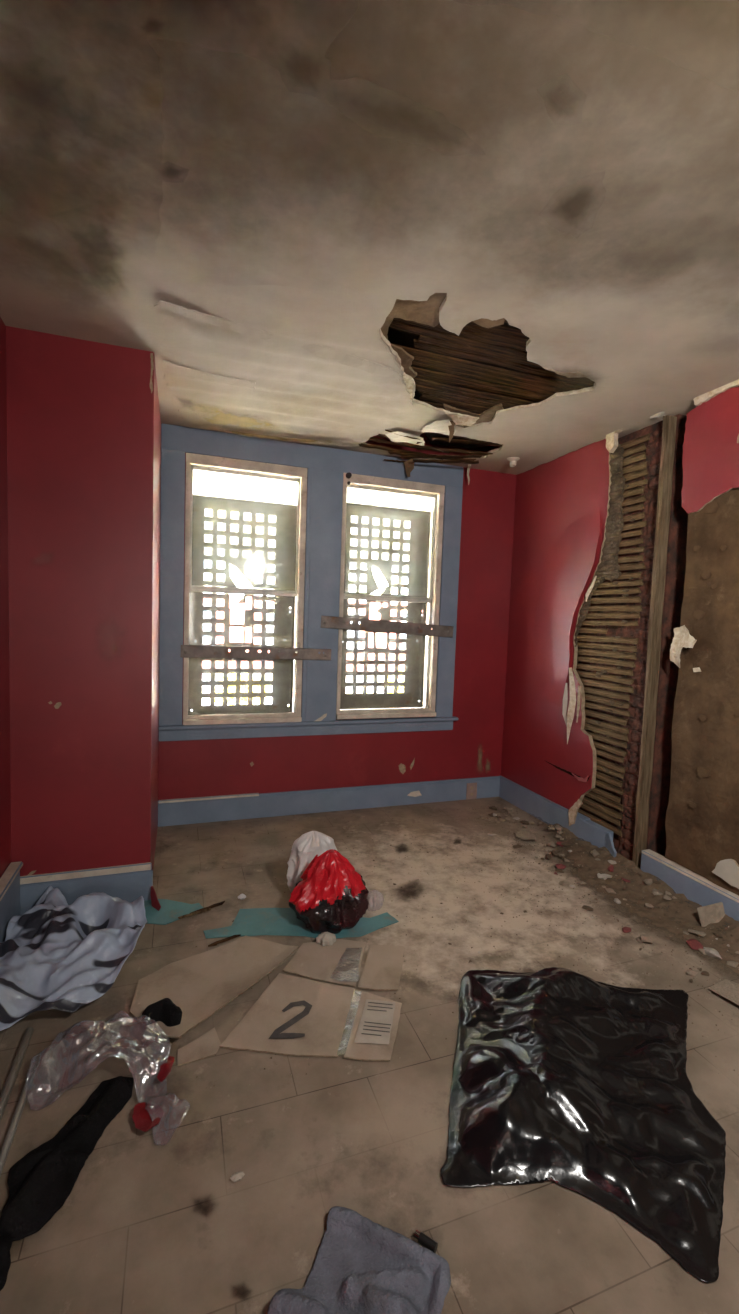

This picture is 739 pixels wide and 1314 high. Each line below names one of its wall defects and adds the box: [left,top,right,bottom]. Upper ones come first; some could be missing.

flaking render [562,411,665,861]
spalling [665,379,739,896]